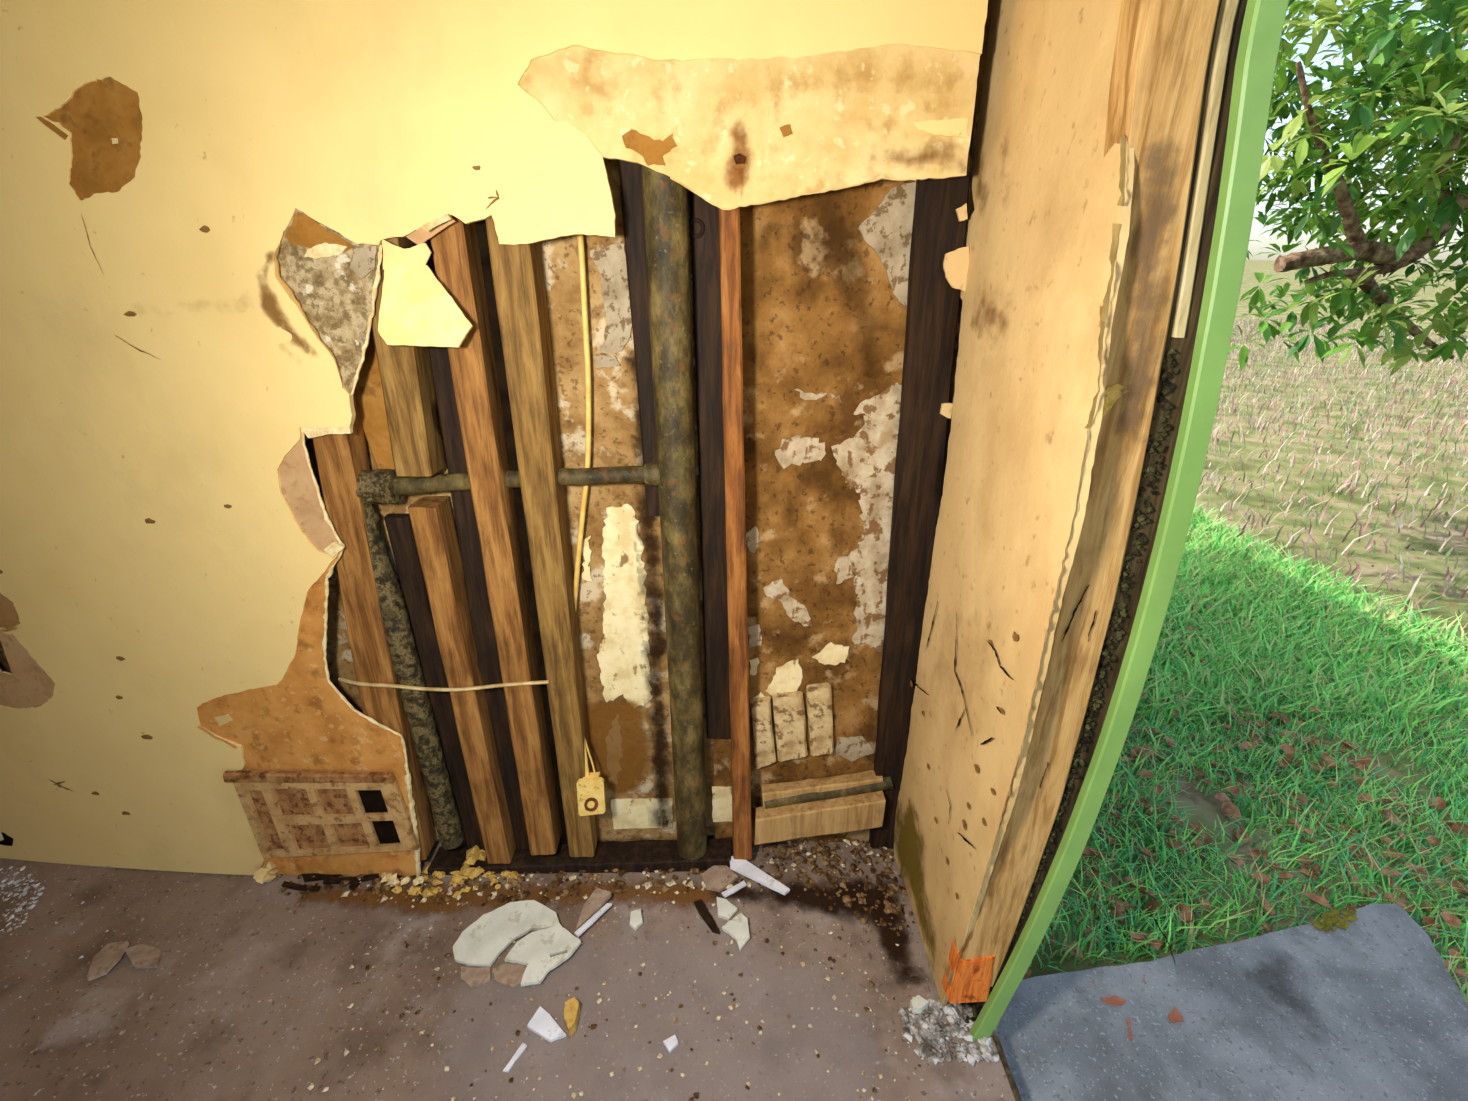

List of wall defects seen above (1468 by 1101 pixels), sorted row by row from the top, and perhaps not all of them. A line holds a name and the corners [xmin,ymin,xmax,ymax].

peeling [36,77,142,200]
peeling [0,593,55,709]
peeling [197,428,440,877]
spalling [376,394,461,692]
spalling [518,0,992,843]
water stain [300,803,934,983]